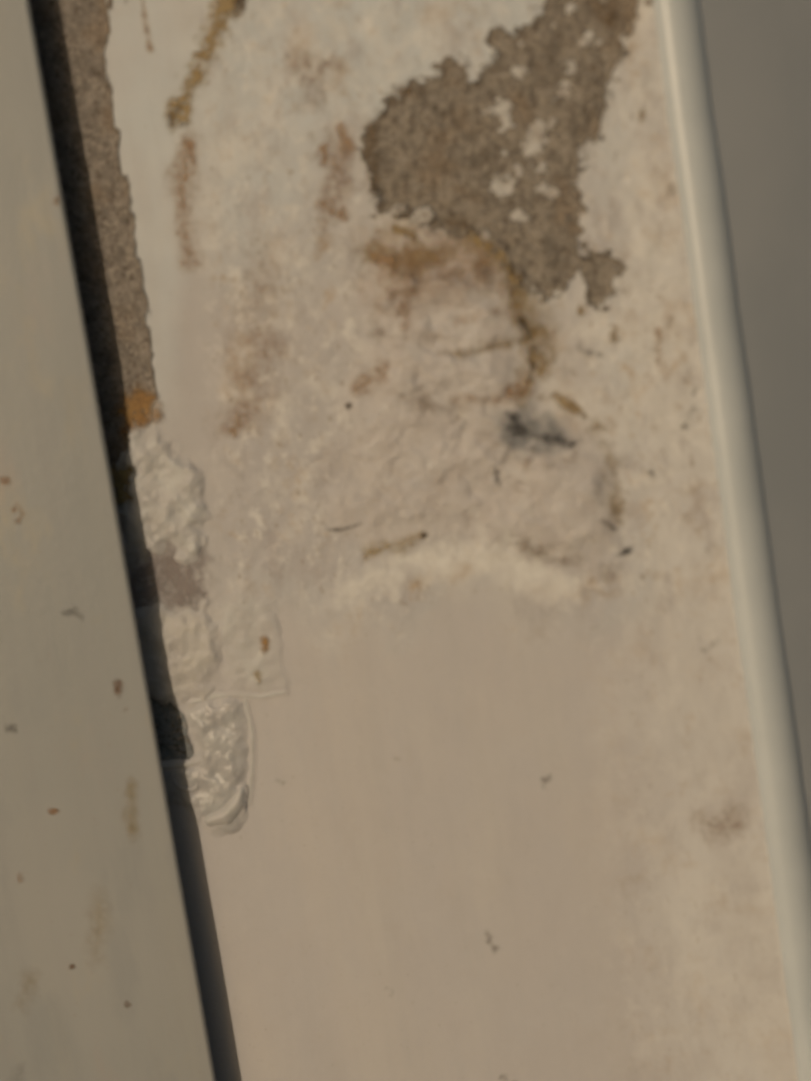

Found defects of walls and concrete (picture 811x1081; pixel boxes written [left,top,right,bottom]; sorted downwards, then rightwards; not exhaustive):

spalling [30,0,156,508]
rust [167,0,244,126]
leakage [367,224,447,276]
spalling [356,0,651,315]